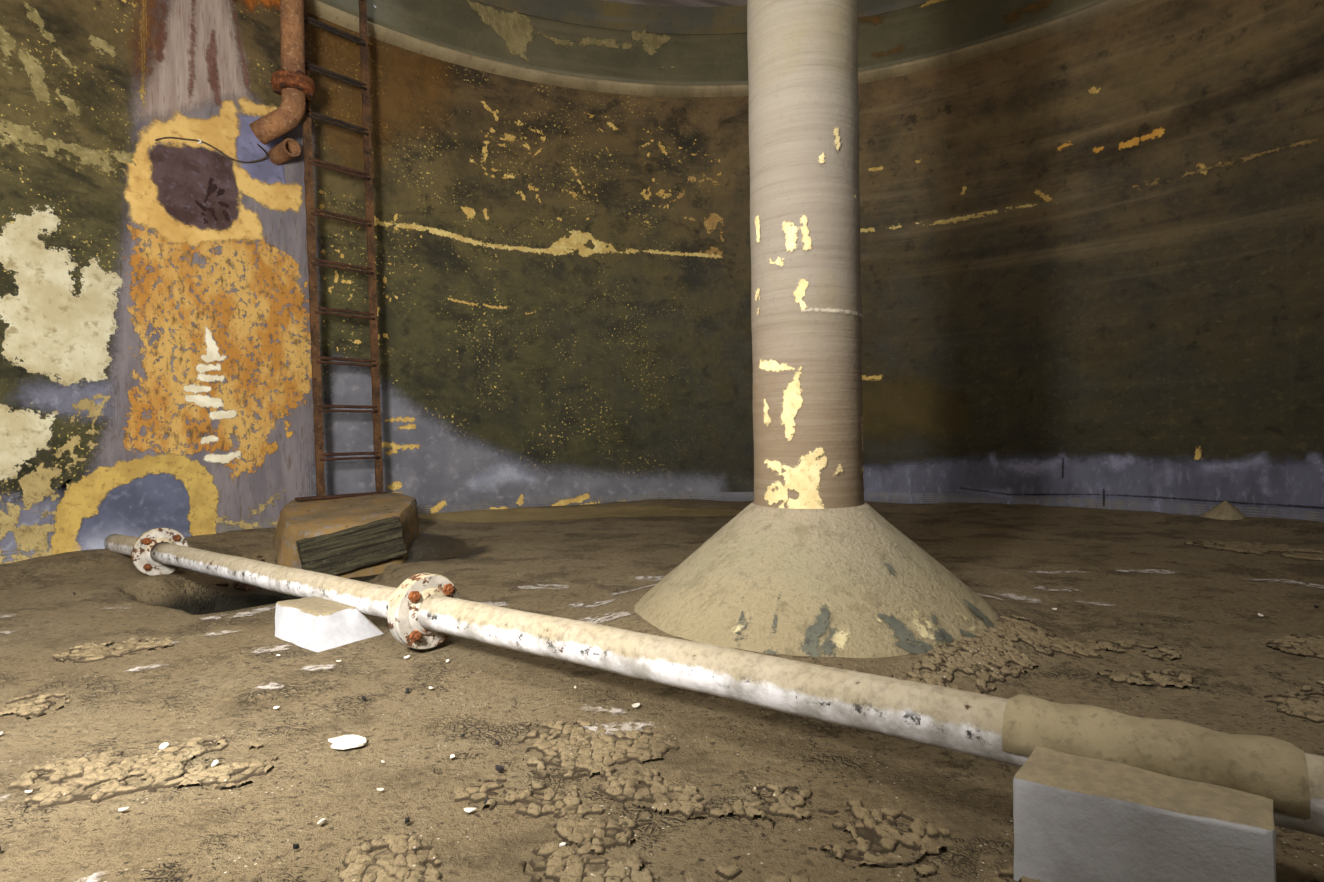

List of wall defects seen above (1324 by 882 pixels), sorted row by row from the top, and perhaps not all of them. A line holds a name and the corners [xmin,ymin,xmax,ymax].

water stain [134,0,263,168]
corrosion [50,0,312,555]
water stain [87,123,320,533]
peeling [0,204,124,564]
water stain [75,493,107,549]
flaking render [76,473,192,550]
flaking render [309,360,723,514]
peeling [759,359,803,441]
peeling [764,448,843,509]
water stain [990,456,1065,474]
flaking render [861,418,1324,521]
water stain [1105,456,1133,471]